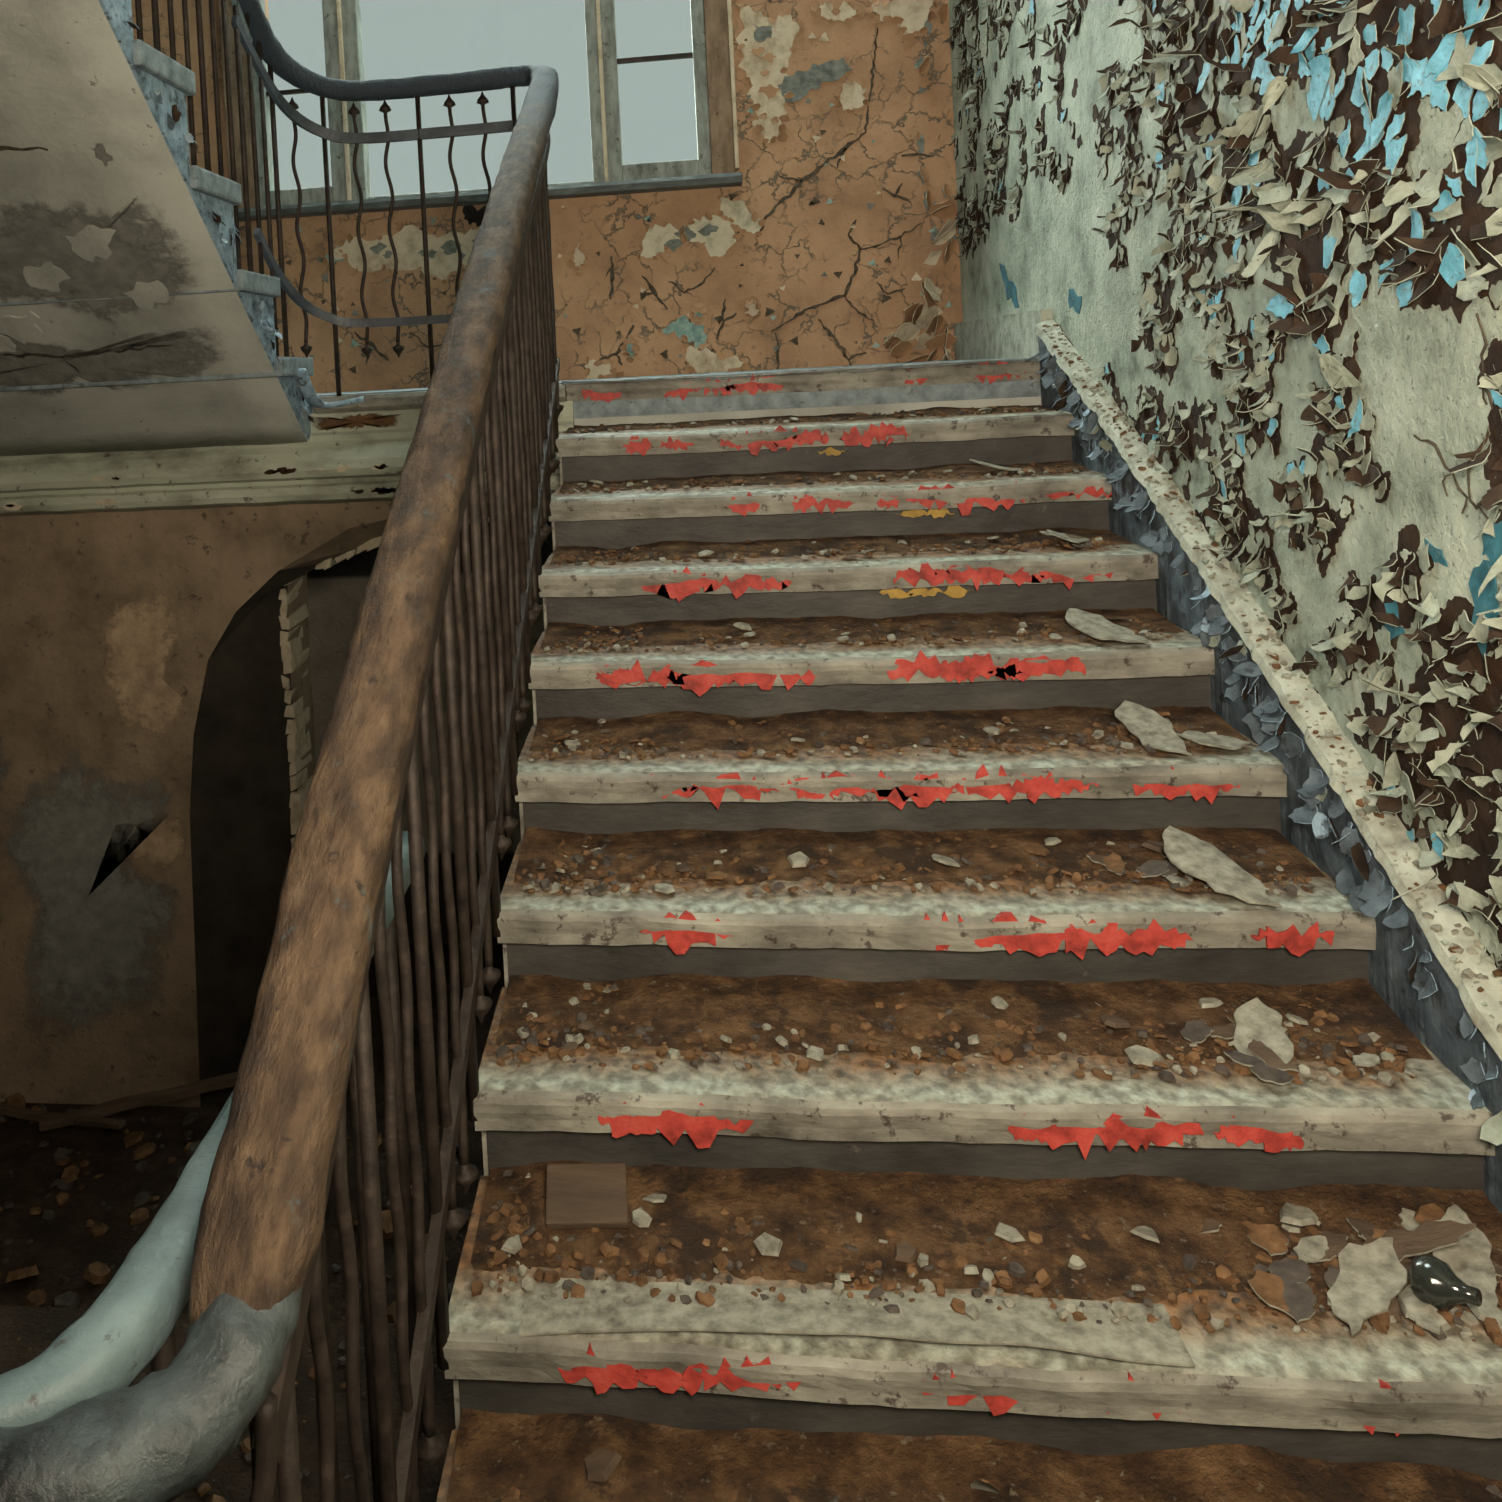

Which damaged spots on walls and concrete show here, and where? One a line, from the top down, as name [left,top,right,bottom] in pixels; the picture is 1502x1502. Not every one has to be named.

crack [757,28,878,237]
peeling [307,217,480,316]
peeling [635,192,766,266]
crack [772,153,934,369]
crack [599,256,737,366]
peeling [641,566,792,602]
peeling [595,659,816,697]
peeling [662,764,1098,810]
peeling [1459,1011,1502,1146]
peeling [598,1101,754,1149]
peeling [1007,1105,1305,1160]
peeling [557,1343,801,1396]